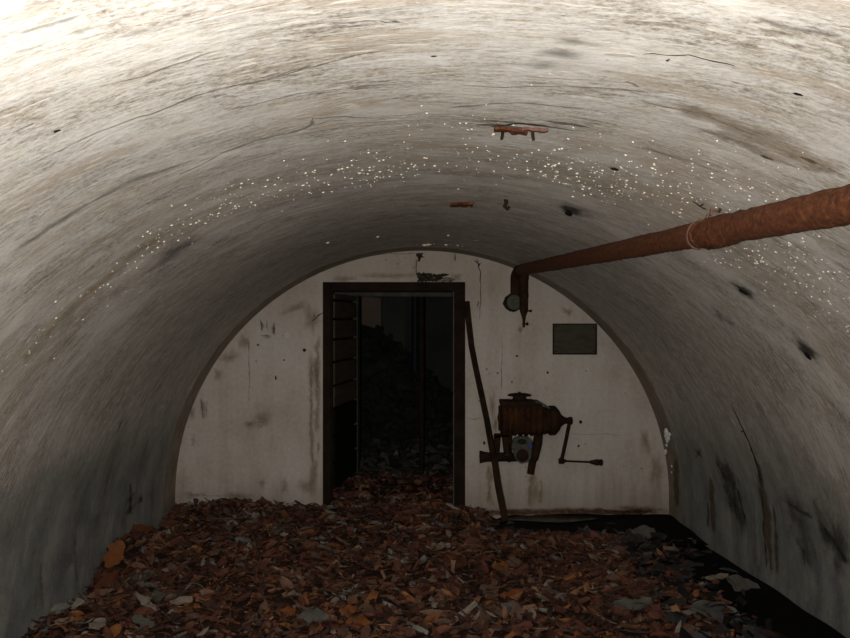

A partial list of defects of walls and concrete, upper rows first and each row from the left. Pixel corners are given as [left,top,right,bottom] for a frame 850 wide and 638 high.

crack [648,53,736,67]
crack [731,405,767,568]